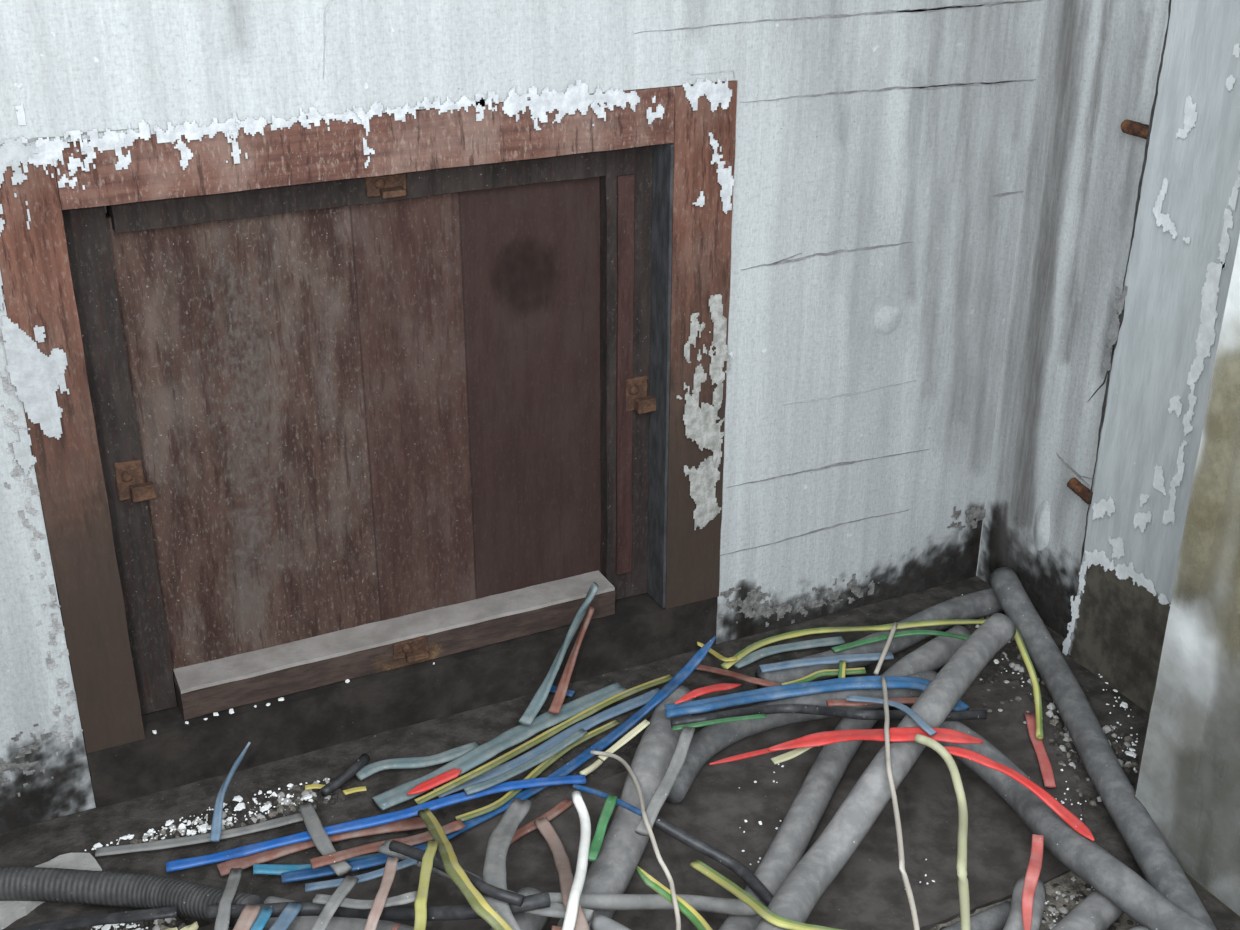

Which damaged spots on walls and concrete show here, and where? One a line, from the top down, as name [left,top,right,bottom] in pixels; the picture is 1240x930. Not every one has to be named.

peeling [0,80,664,229]
peeling [692,191,705,207]
peeling [683,78,732,112]
peeling [709,132,734,214]
peeling [1176,95,1198,139]
spalling [1102,285,1128,371]
peeling [1133,160,1240,533]
peeling [676,294,731,530]
peeling [0,272,83,797]
peeling [1092,497,1116,520]
peeling [1062,536,1171,655]
water stain [0,741,92,833]